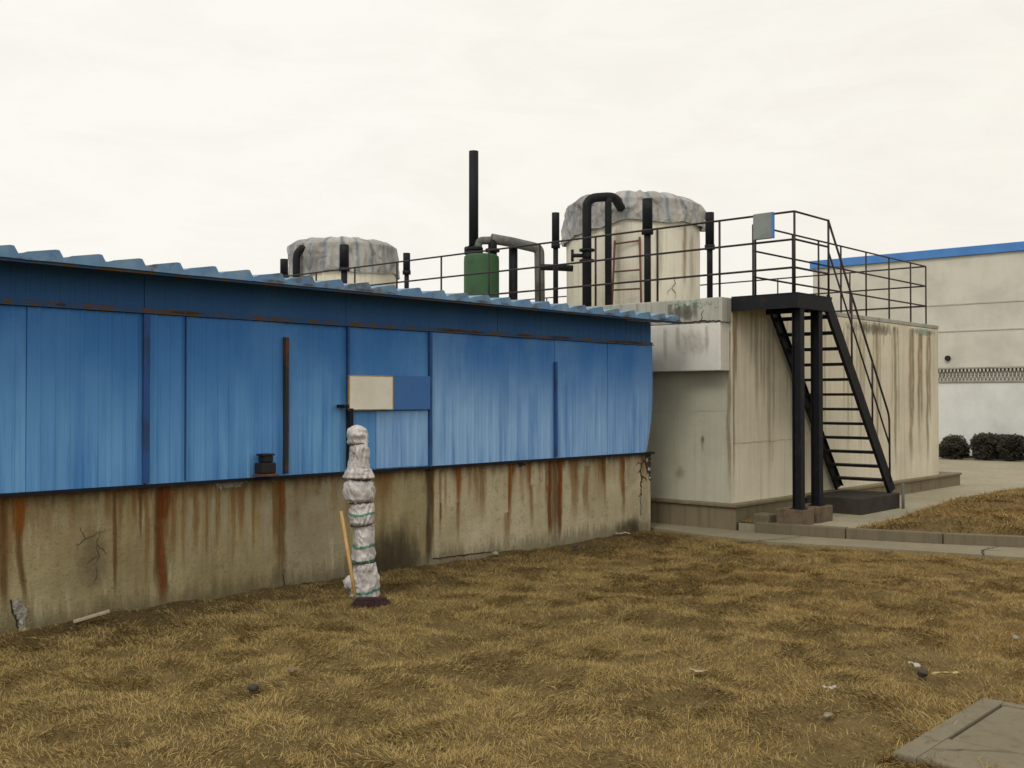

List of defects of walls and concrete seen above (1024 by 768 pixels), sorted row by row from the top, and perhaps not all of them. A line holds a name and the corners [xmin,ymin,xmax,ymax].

rust [1,498,25,594]
rust [155,487,169,594]
rust [547,461,562,528]
crack [637,459,647,515]